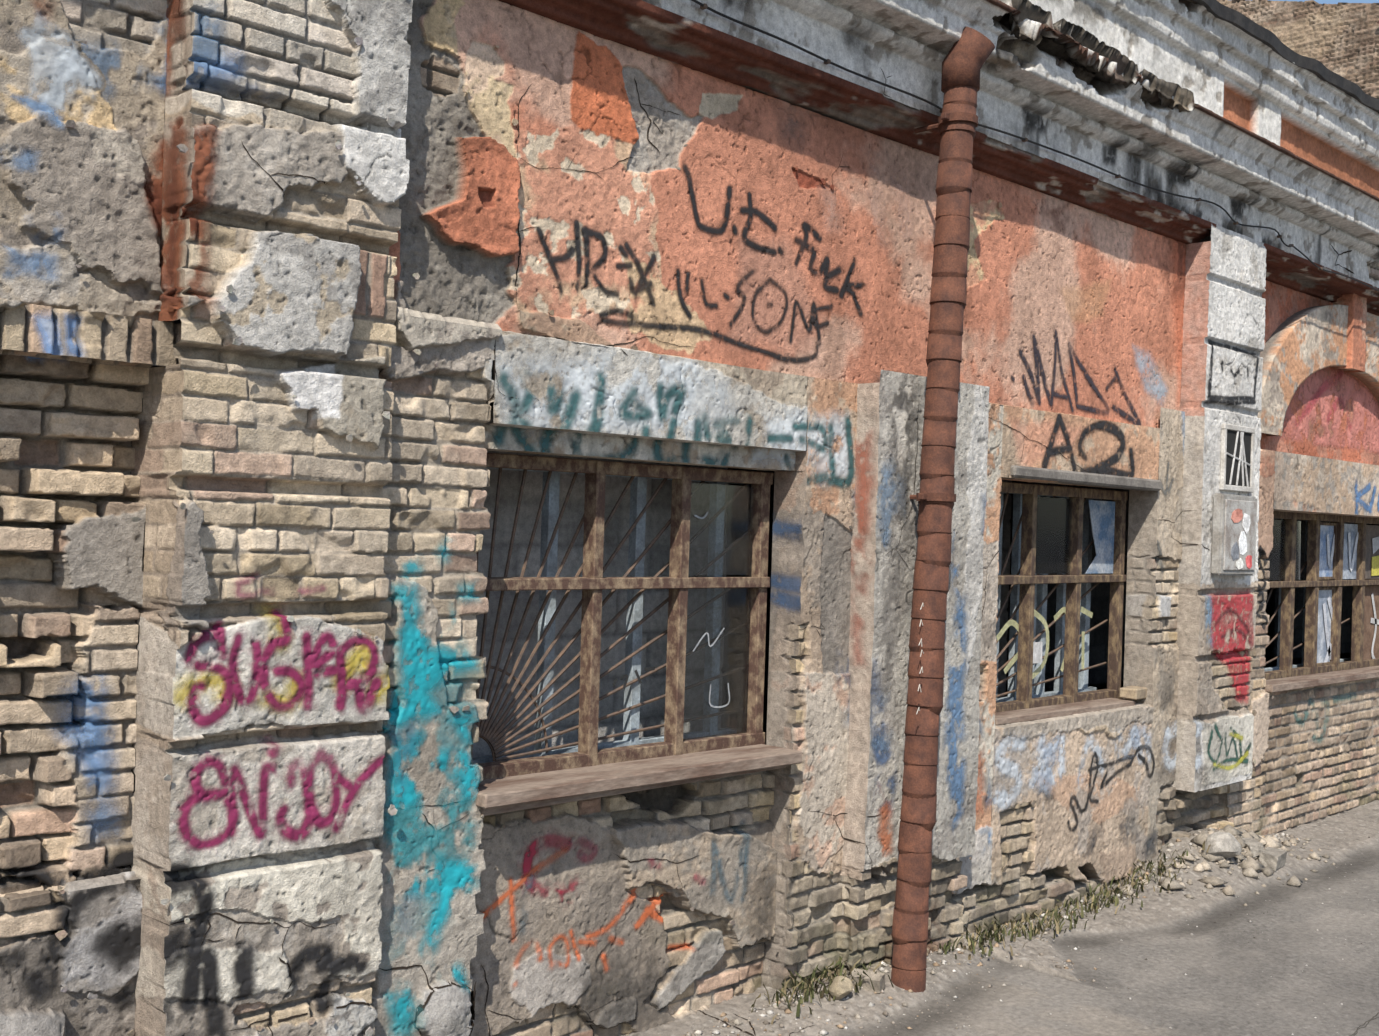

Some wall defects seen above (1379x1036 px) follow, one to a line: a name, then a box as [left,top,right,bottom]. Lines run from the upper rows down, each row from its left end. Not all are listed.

corrosion [166,0,180,73]
flaking render [992,0,1201,112]
peeling [4,111,164,293]
corrosion [146,117,215,321]
flaking render [176,0,638,350]
flaking render [622,65,704,173]
peeling [279,356,390,447]
peeling [481,770,843,1015]
flaking render [999,800,1100,885]
crack [143,912,370,1036]
crack [380,965,521,1036]
crack [1349,1012,1379,1036]